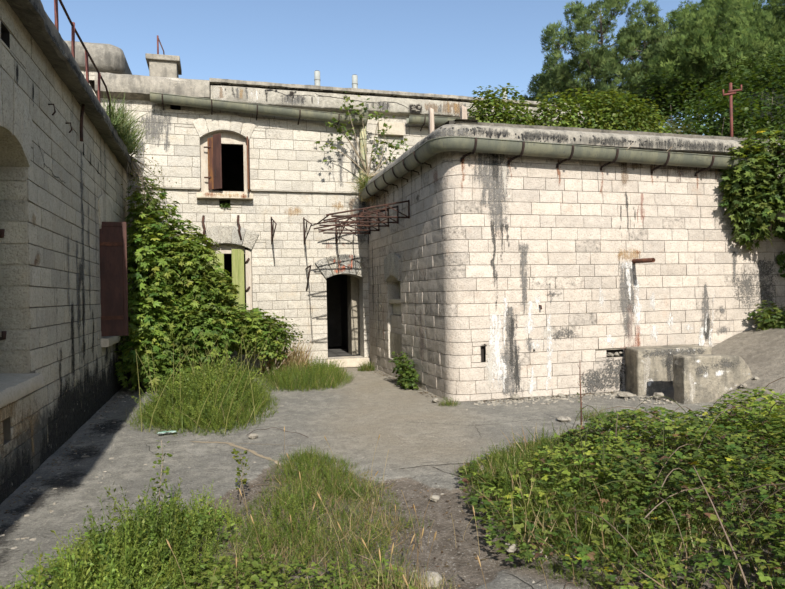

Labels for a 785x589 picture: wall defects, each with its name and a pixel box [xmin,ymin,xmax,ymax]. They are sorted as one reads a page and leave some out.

leakage [0,153,131,513]
leakage [471,153,553,396]
leakage [620,261,655,335]
leakage [0,523,19,563]